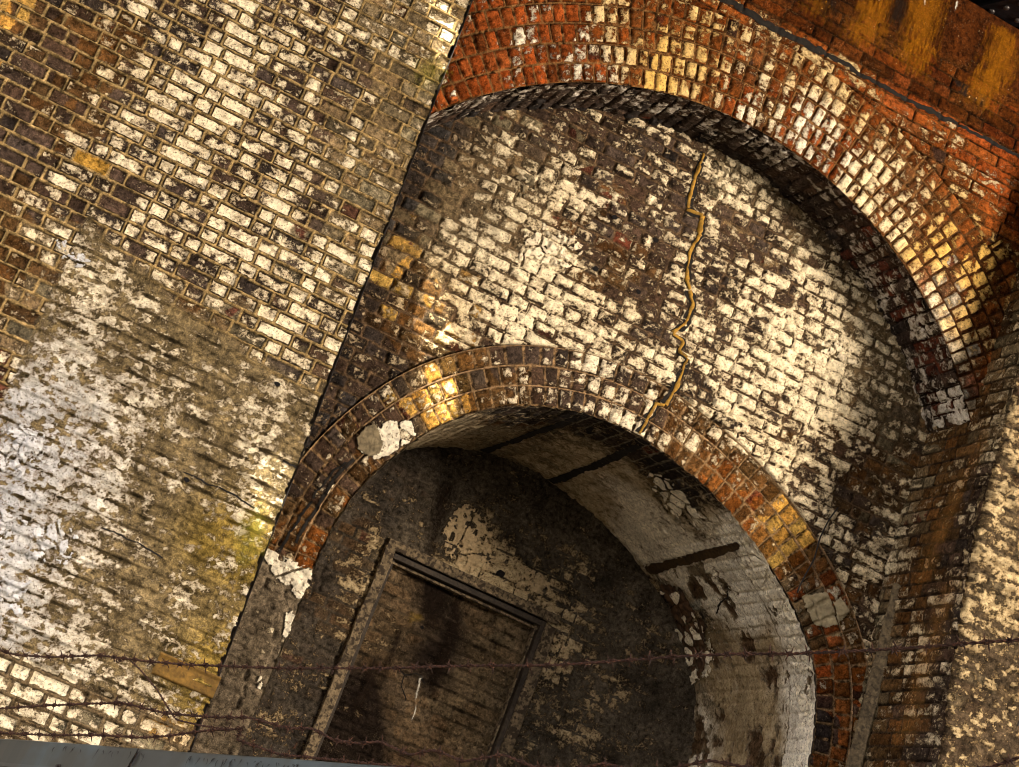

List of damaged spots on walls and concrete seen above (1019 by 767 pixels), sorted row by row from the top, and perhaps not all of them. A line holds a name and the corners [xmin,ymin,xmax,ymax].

crack [719,0,1019,158]
crack [548,151,707,484]
peeling [357,420,416,459]
peeling [264,549,312,599]
peeling [282,611,295,638]